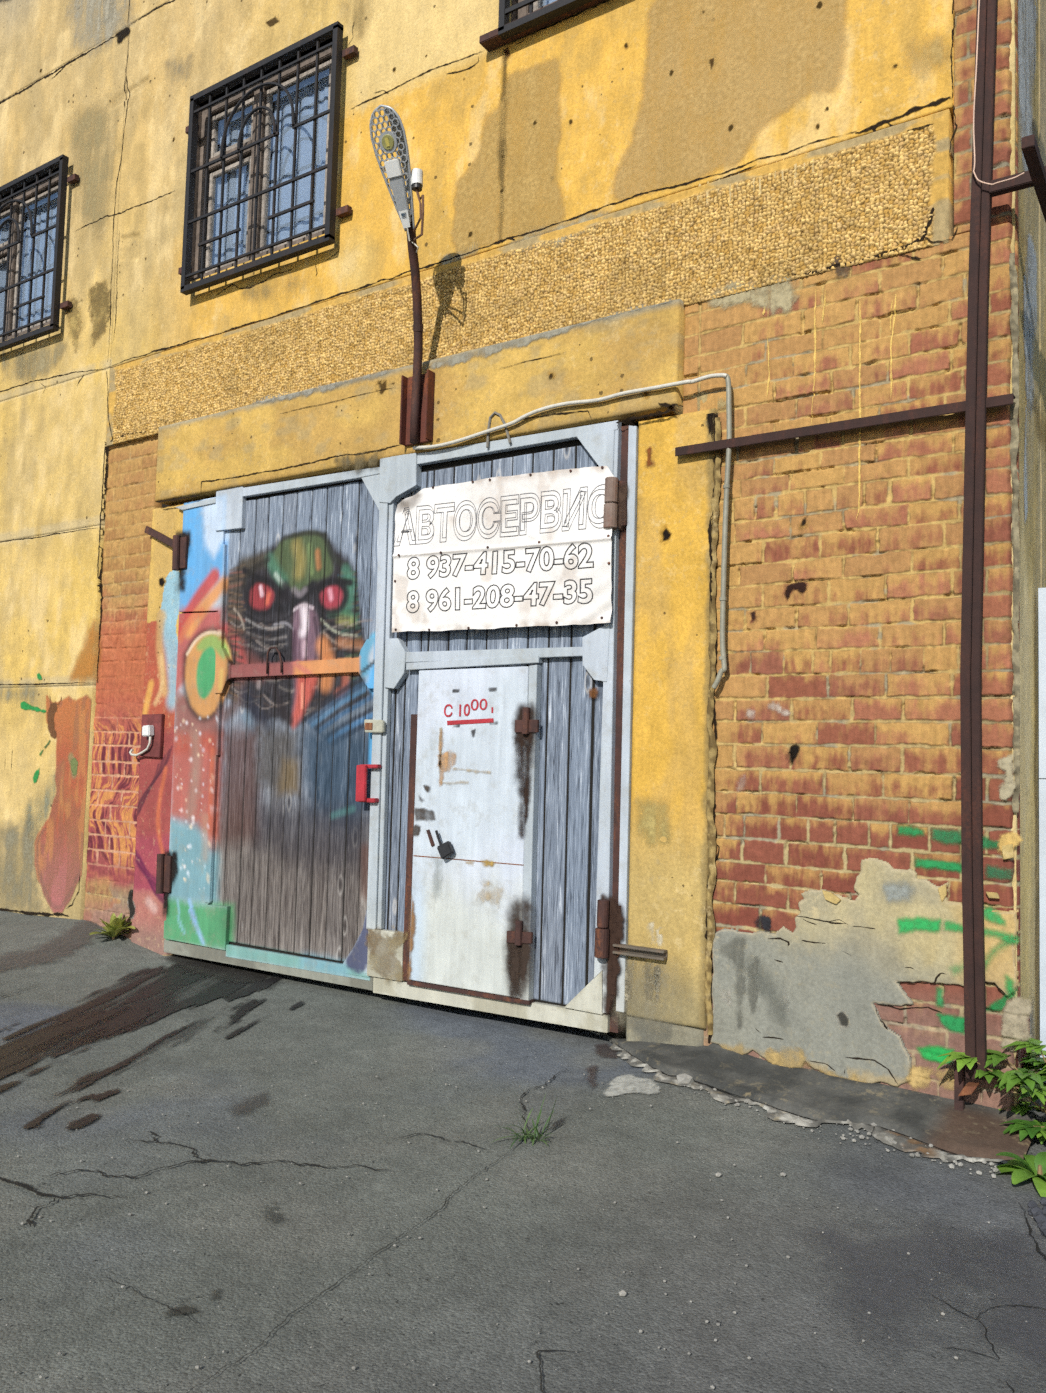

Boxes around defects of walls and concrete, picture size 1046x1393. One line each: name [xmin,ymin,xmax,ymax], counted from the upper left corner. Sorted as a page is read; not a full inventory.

crack [0,0,958,685]
spalling [998,253,1038,813]
rust [514,705,535,835]
flaking render [704,413,964,1089]
spalling [998,832,1023,859]
crack [26,1197,56,1227]
damp [0,962,284,1130]
crack [126,1131,208,1161]
rust [506,901,532,997]
spalling [585,1029,1007,1164]
flaking render [984,892,1031,1068]
crack [944,1320,1000,1360]